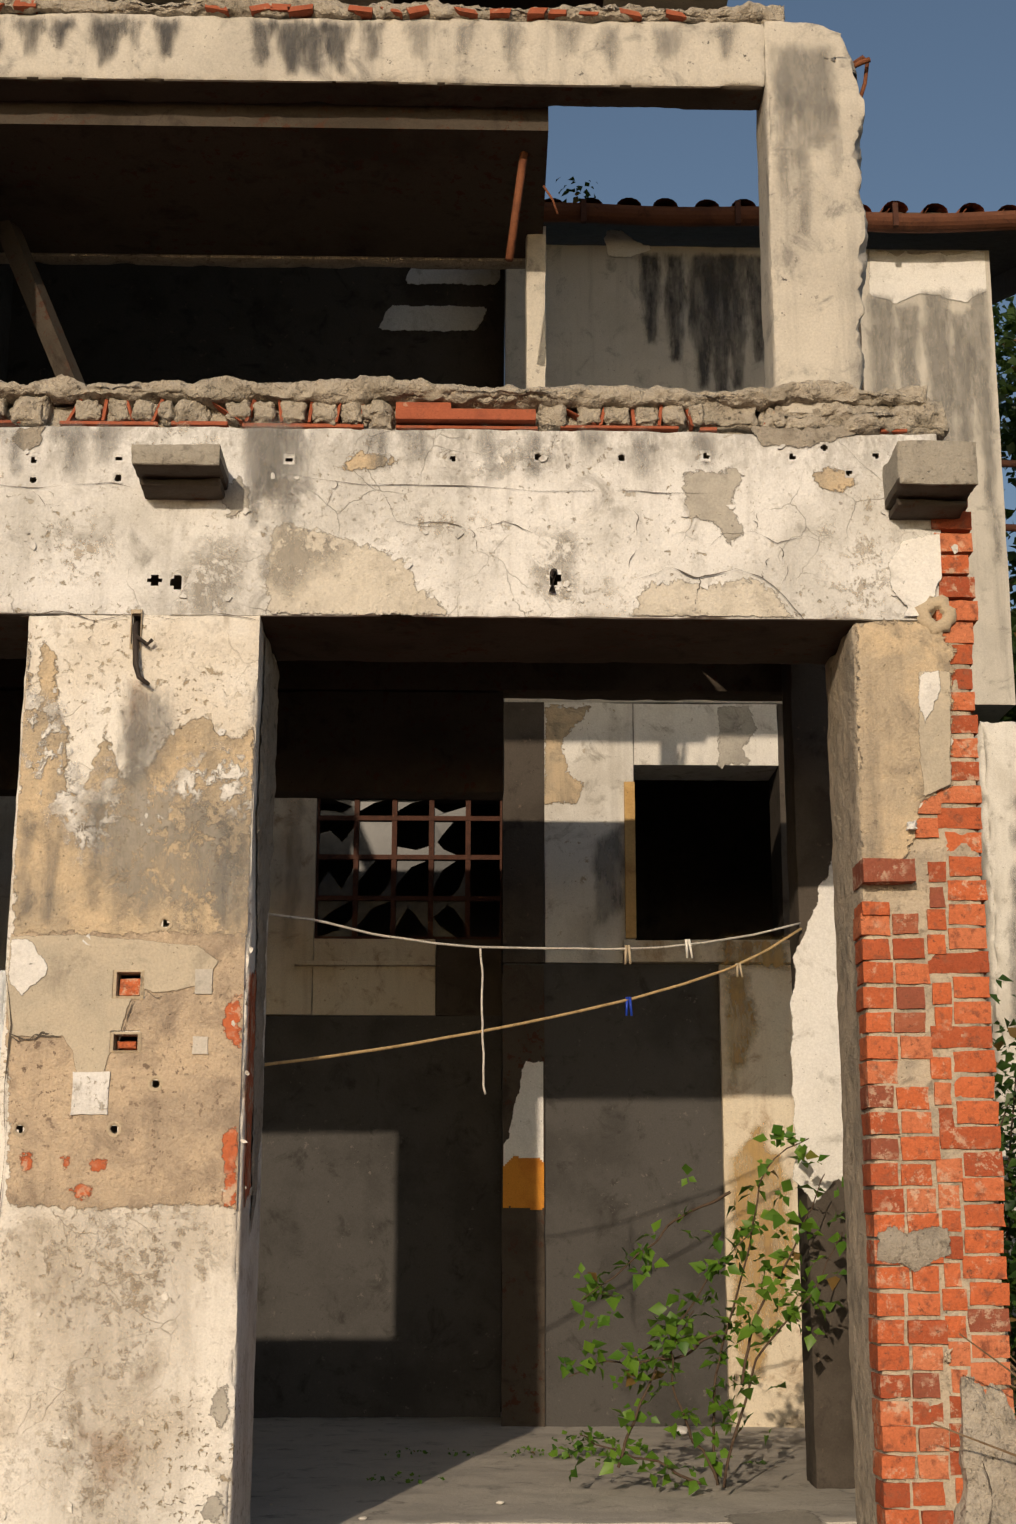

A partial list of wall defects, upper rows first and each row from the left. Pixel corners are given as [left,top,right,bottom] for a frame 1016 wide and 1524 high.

damp [92,20,125,62]
damp [156,20,176,54]
damp [255,23,349,71]
corrosion [505,151,528,262]
damp [642,254,764,392]
spalling [699,397,950,449]
peeling [263,522,447,615]
crack [264,466,533,554]
peeling [681,467,745,545]
crack [621,490,819,619]
peeling [854,619,957,859]
peeling [3,636,279,1232]